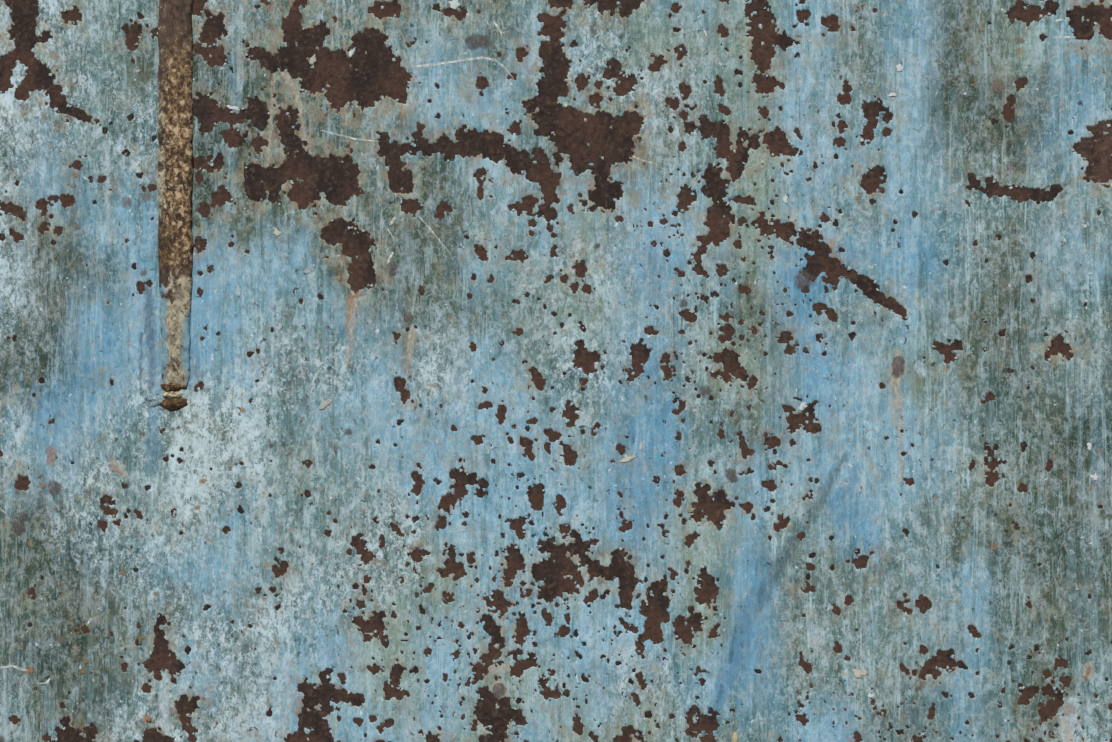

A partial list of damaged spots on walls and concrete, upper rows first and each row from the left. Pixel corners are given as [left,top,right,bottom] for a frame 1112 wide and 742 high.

rust [121,12,158,64]
rust [69,155,158,206]
rust [192,0,428,363]
rust [376,0,908,450]
rust [131,263,153,297]
rust [255,548,289,611]
rust [825,594,860,616]
rust [830,548,874,571]
rust [120,612,200,742]